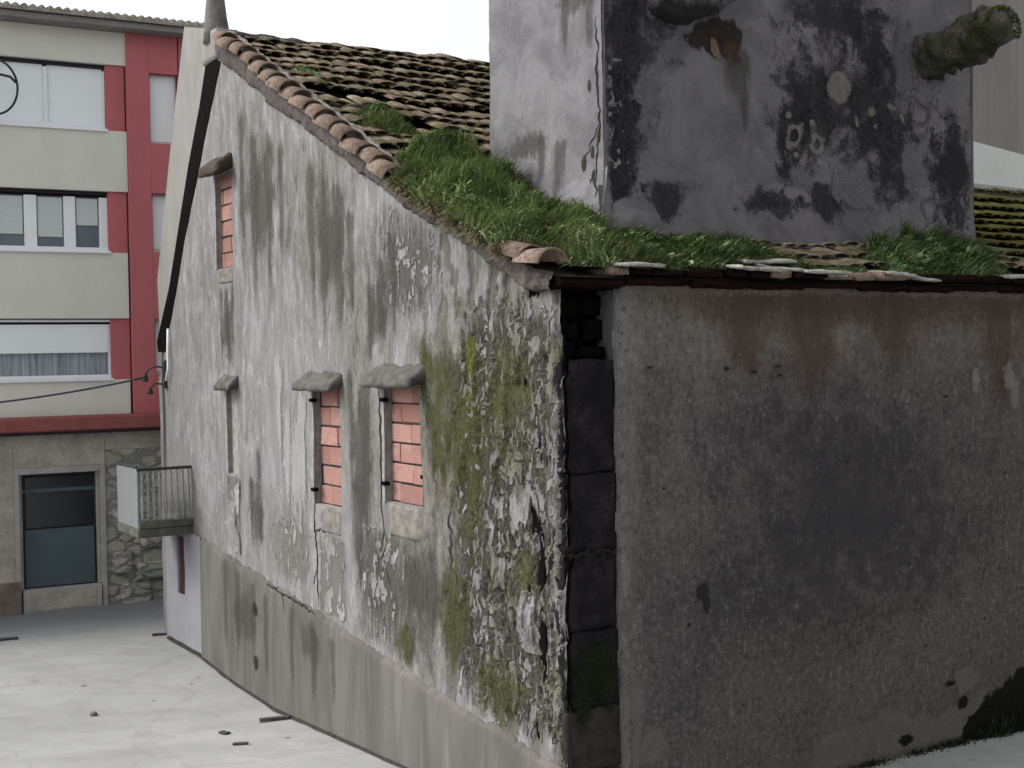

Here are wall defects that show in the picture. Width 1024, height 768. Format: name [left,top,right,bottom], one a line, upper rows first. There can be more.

leakage [219,287,233,364]
leakage [238,116,284,280]
leakage [306,166,353,325]
flaking render [367,209,443,316]
crack [585,17,601,197]
leakage [607,79,687,223]
spalling [684,17,750,126]
leakage [734,100,844,224]
leakage [866,115,971,233]
crack [267,503,326,614]
flaking render [273,515,405,647]
flaking render [443,292,564,744]